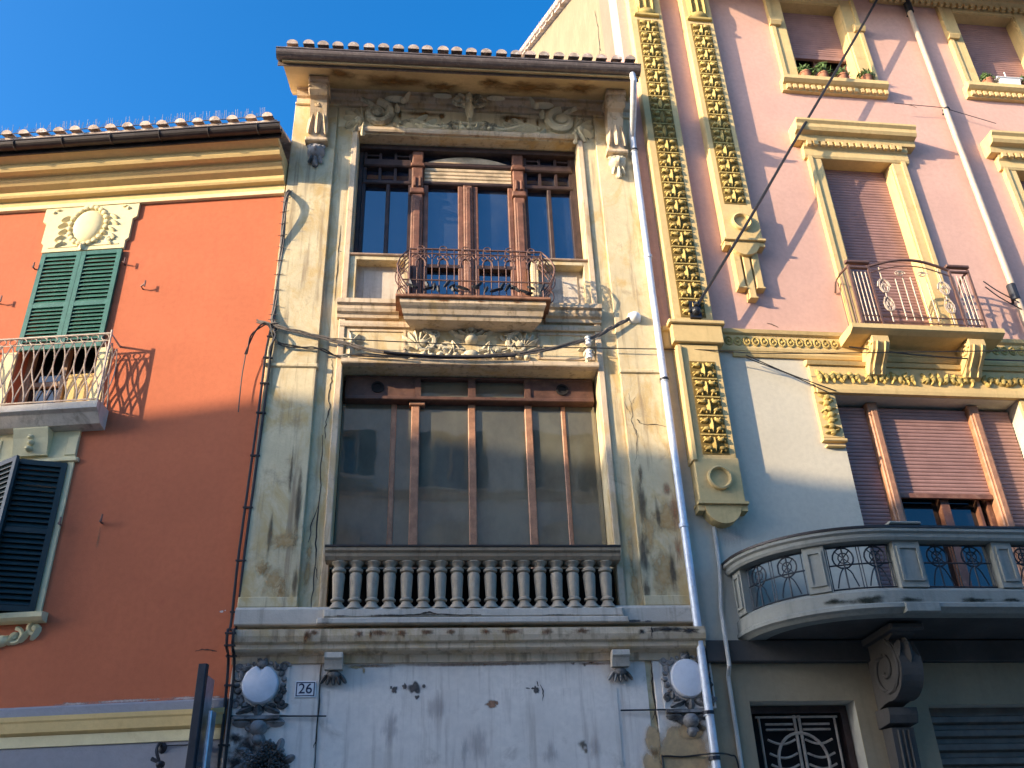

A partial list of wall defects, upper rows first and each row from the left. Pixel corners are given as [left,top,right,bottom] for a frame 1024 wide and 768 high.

crack [625,393,663,458]
water stain [268,457,301,550]
water stain [628,469,676,598]
spalling [390,681,426,699]